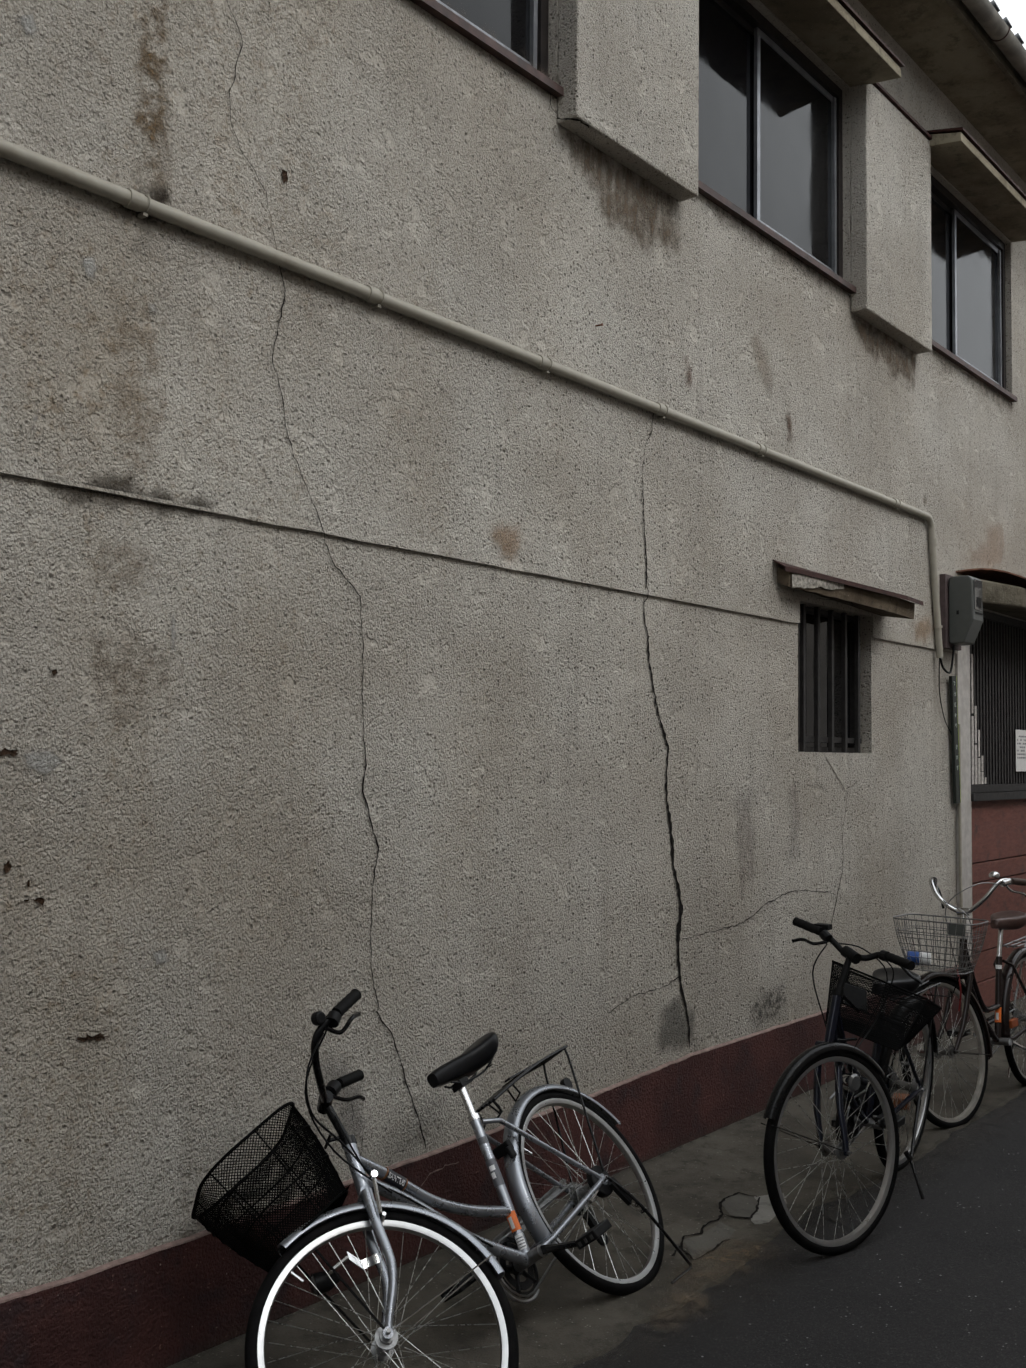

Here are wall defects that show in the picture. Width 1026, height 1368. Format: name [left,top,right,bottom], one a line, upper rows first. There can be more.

rust [136,38,164,177]
crack [227,1,426,1148]
crack [609,414,854,1055]